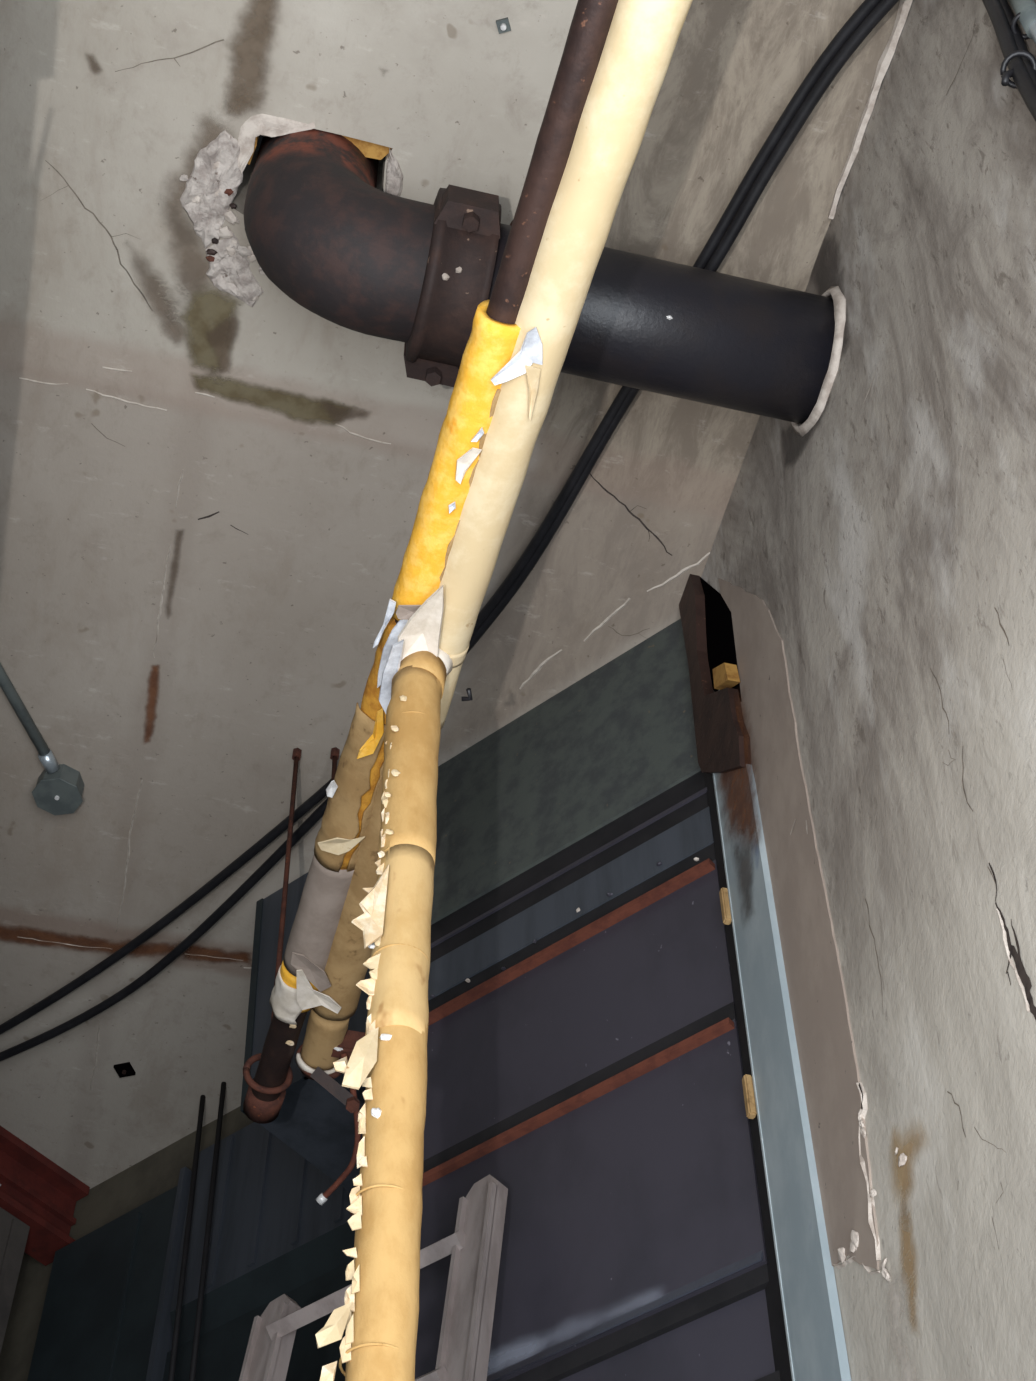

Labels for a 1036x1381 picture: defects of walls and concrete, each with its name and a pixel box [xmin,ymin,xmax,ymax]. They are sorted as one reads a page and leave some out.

damp [228,0,275,114]
spalling [180,114,315,308]
damp [142,127,367,424]
spalling [385,148,403,197]
rust [168,532,182,611]
rust [145,666,158,742]
rust [720,705,759,910]
crack [988,863,1036,1020]
flaking render [832,1082,890,1282]
flaking render [895,1147,907,1167]